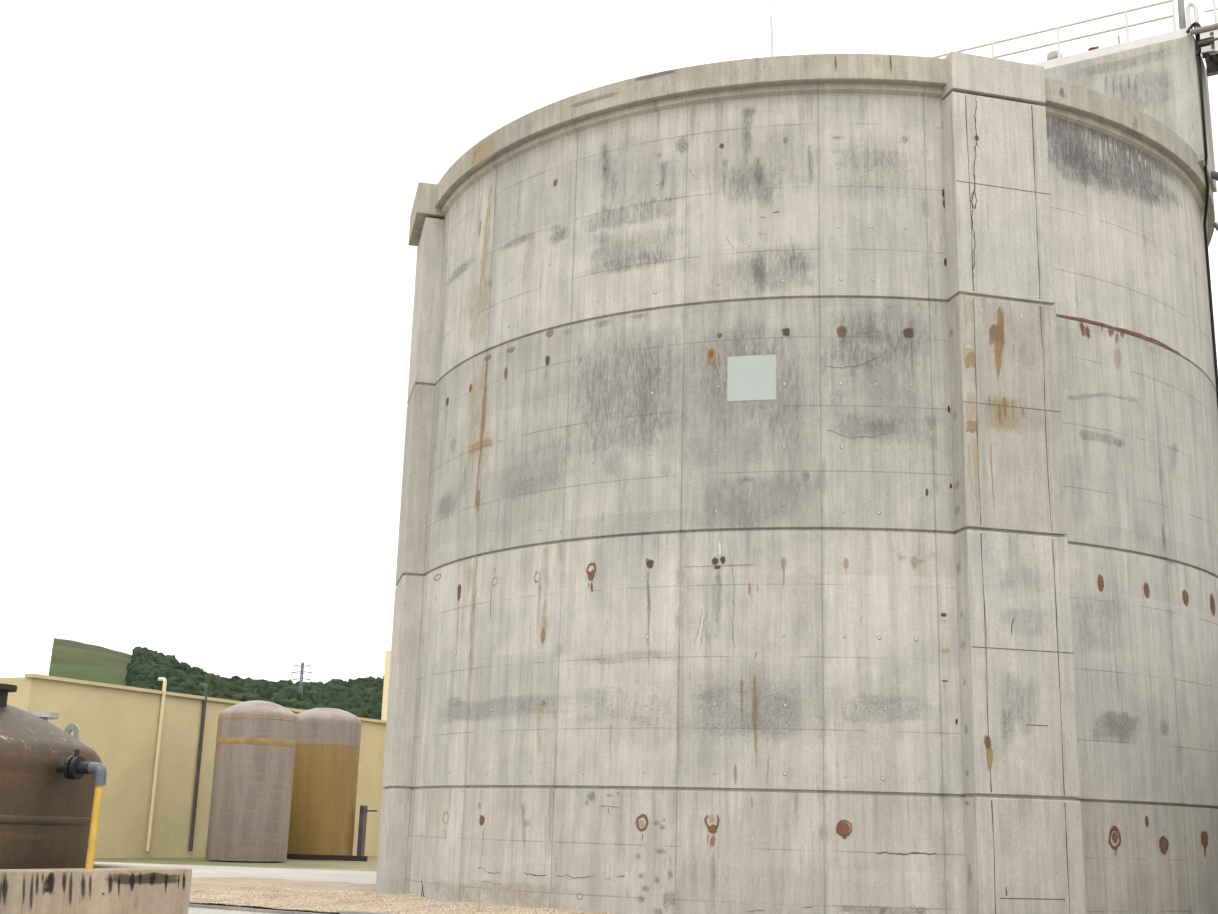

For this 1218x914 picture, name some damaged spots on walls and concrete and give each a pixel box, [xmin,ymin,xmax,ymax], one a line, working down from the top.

leakage [1047,119,1167,202]
rust [995,307,1004,375]
rust [586,563,596,591]
rust [636,814,649,839]
rust [704,815,719,846]
rust [836,820,852,839]
rust [1109,826,1121,854]
leakage [0,875,8,904]
leakage [23,872,92,906]
leakage [109,873,185,894]